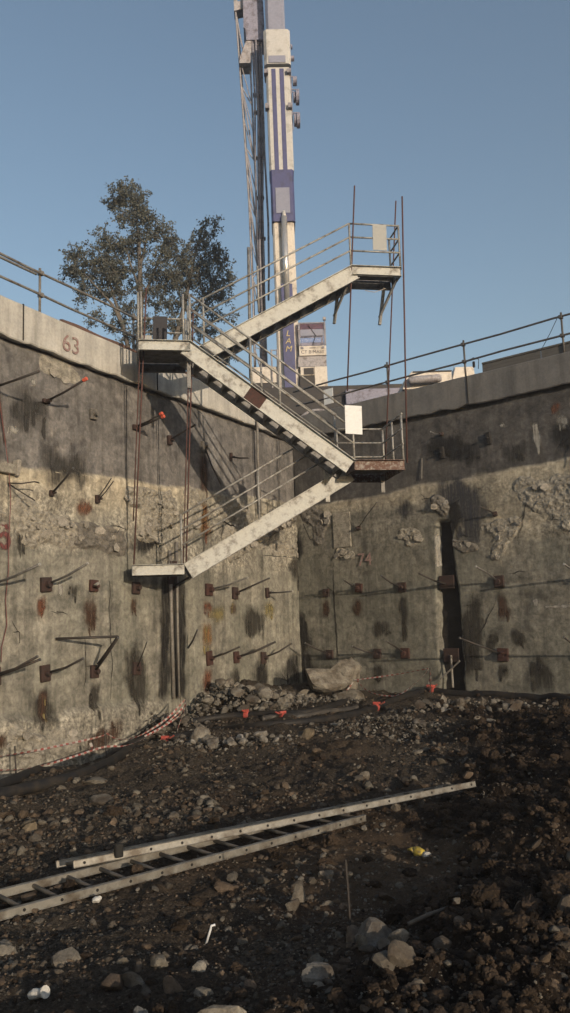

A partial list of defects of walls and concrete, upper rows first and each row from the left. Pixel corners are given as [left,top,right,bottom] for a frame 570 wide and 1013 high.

leakage [126,651,146,715]
leakage [158,576,186,700]